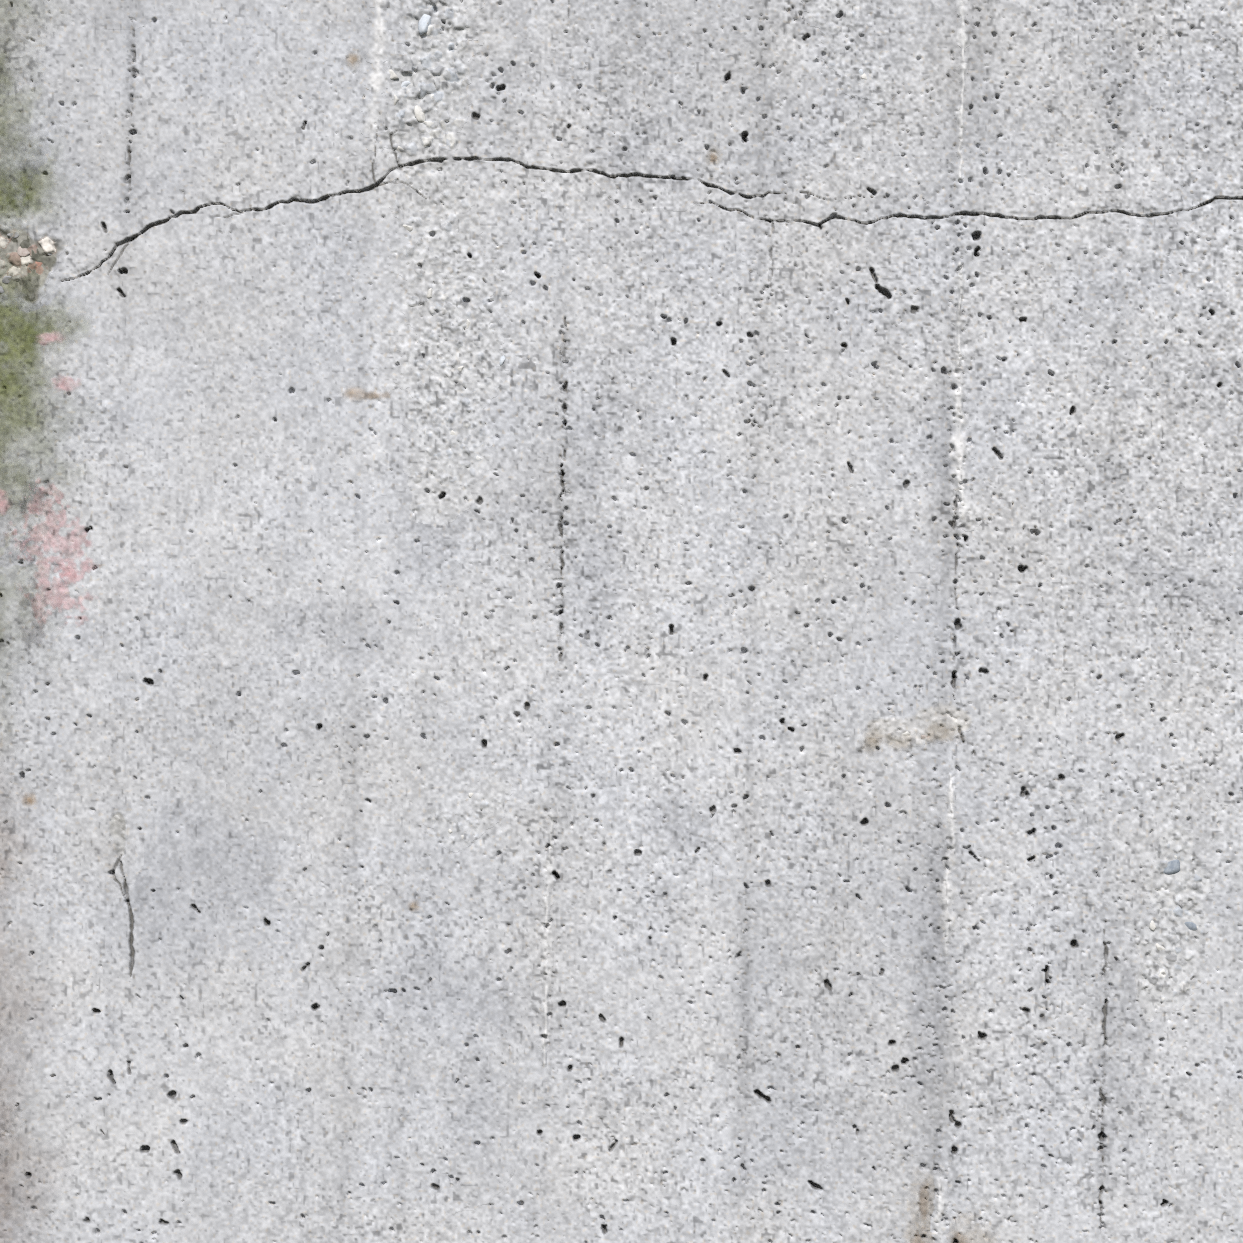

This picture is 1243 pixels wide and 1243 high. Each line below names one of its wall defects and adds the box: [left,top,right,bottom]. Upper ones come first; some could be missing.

crack [62,133,1243,282]